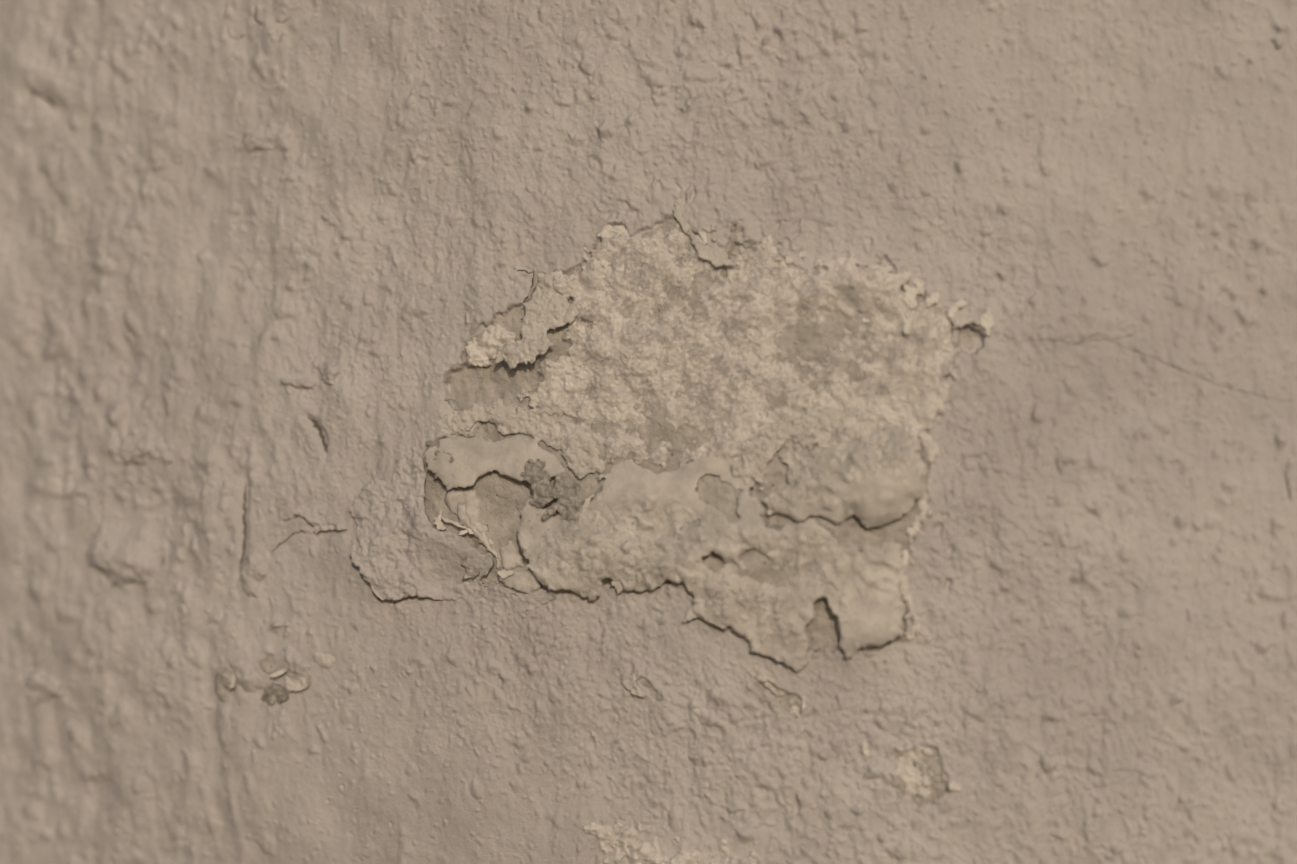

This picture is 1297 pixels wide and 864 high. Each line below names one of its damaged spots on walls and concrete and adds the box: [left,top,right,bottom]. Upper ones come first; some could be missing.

flaking render [349,198,995,611]
flaking render [804,597,841,652]
flaking render [865,596,909,648]